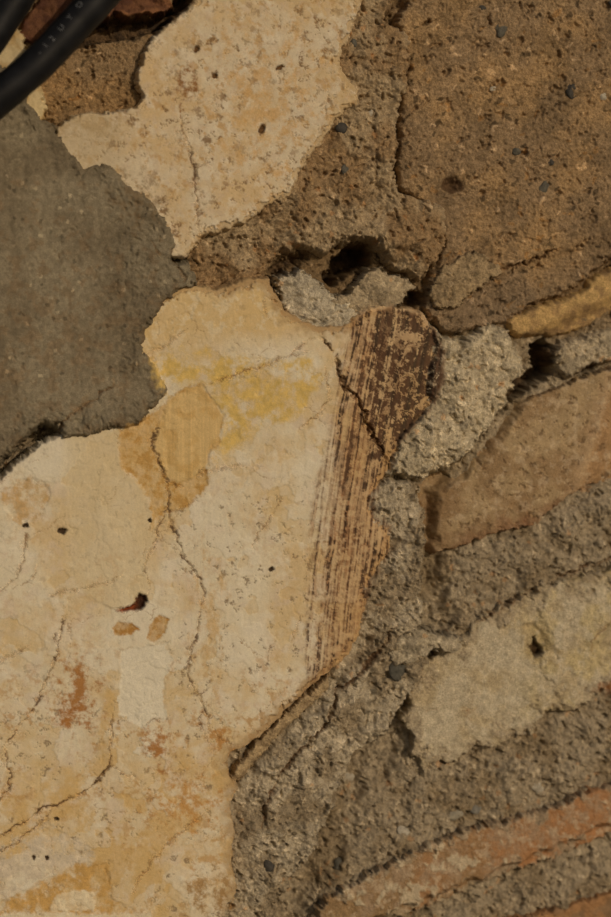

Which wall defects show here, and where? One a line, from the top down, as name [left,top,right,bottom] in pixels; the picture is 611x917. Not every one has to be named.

spalling [78,0,200,49]
hole [321,243,373,287]
hole [397,287,426,310]
peeling [0,474,51,529]
crack [57,377,117,434]
peeling [115,380,227,535]
crack [209,338,394,464]
crack [0,427,248,801]
spalling [229,673,330,782]
crack [260,624,399,829]
crack [0,713,164,852]
crack [129,810,211,896]